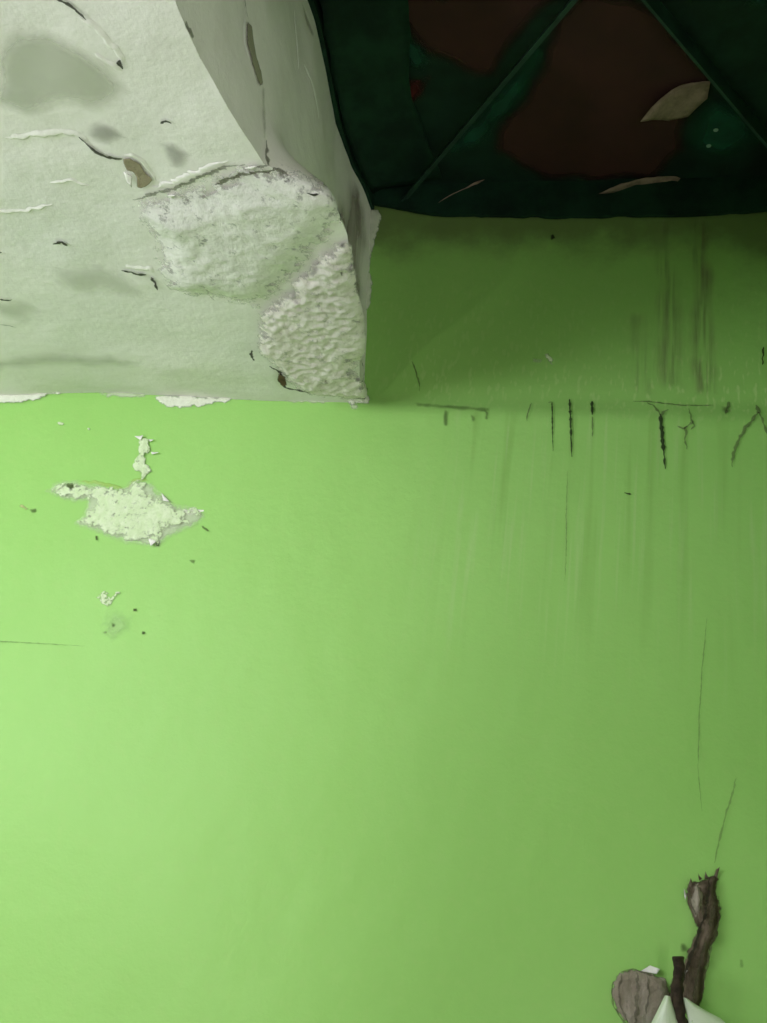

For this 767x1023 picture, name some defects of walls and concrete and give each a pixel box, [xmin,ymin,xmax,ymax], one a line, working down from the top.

peeling [243,20,263,85]
peeling [5,129,156,188]
spalling [249,243,368,400]
damp [647,402,667,469]
crack [638,399,709,407]
damp [731,405,767,467]
spalling [52,435,208,546]
spalling [611,867,721,1023]